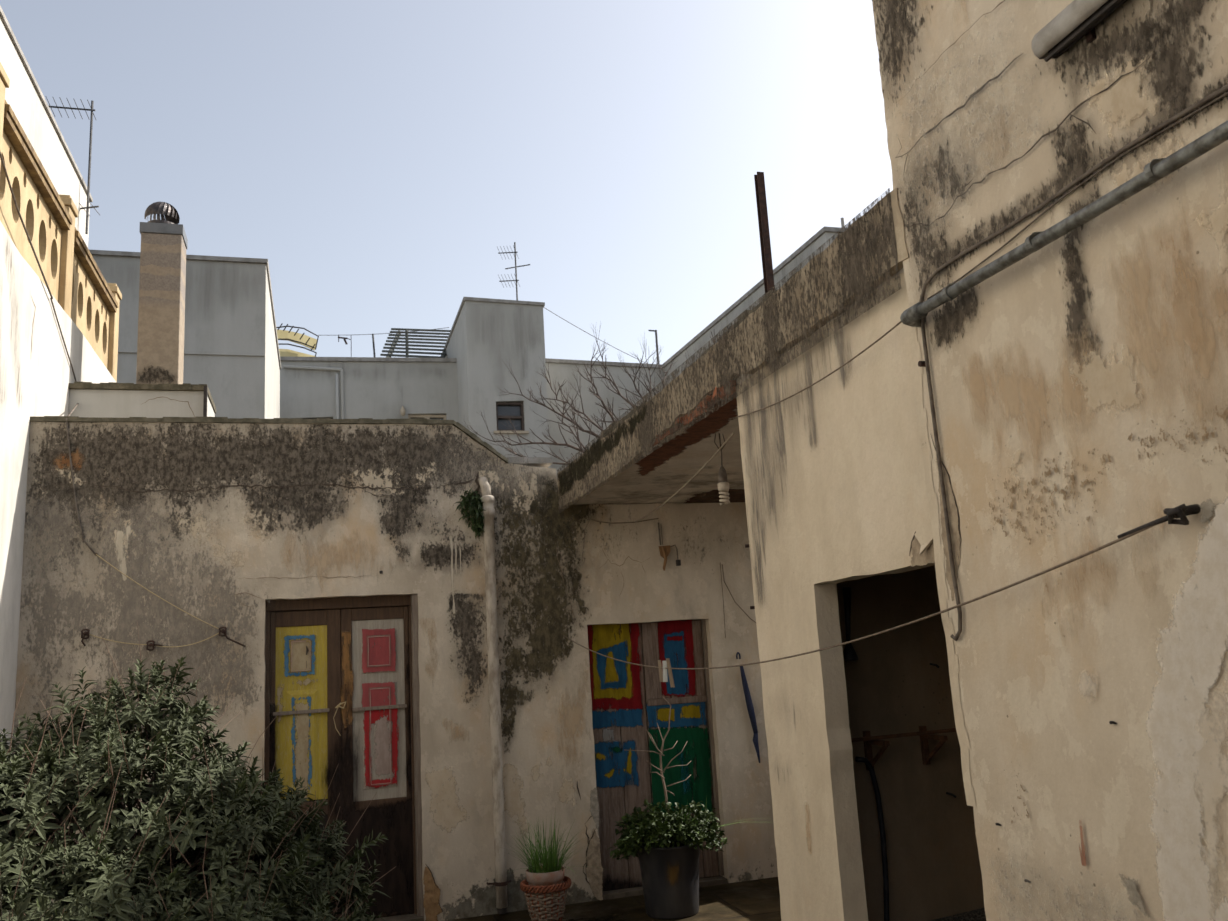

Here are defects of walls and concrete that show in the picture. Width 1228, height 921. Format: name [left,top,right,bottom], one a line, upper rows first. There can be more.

water stain [872,0,933,101]
crack [900,0,1005,100]
crack [895,53,1154,228]
water stain [897,0,1228,302]
water stain [930,287,982,350]
water stain [970,225,1102,457]
water stain [20,188,901,754]
flaking render [423,865,442,921]